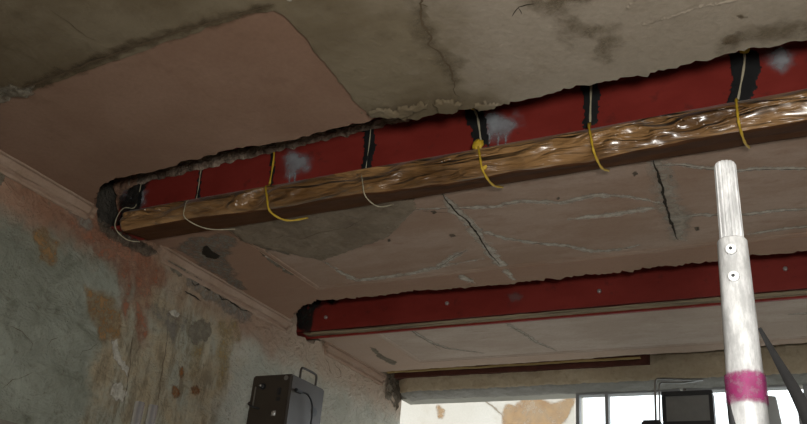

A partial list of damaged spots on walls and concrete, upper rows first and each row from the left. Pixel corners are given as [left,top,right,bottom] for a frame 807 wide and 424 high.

crack [417,0,456,95]
crack [323,160,718,282]
crack [742,209,807,236]
flaking render [157,309,212,345]